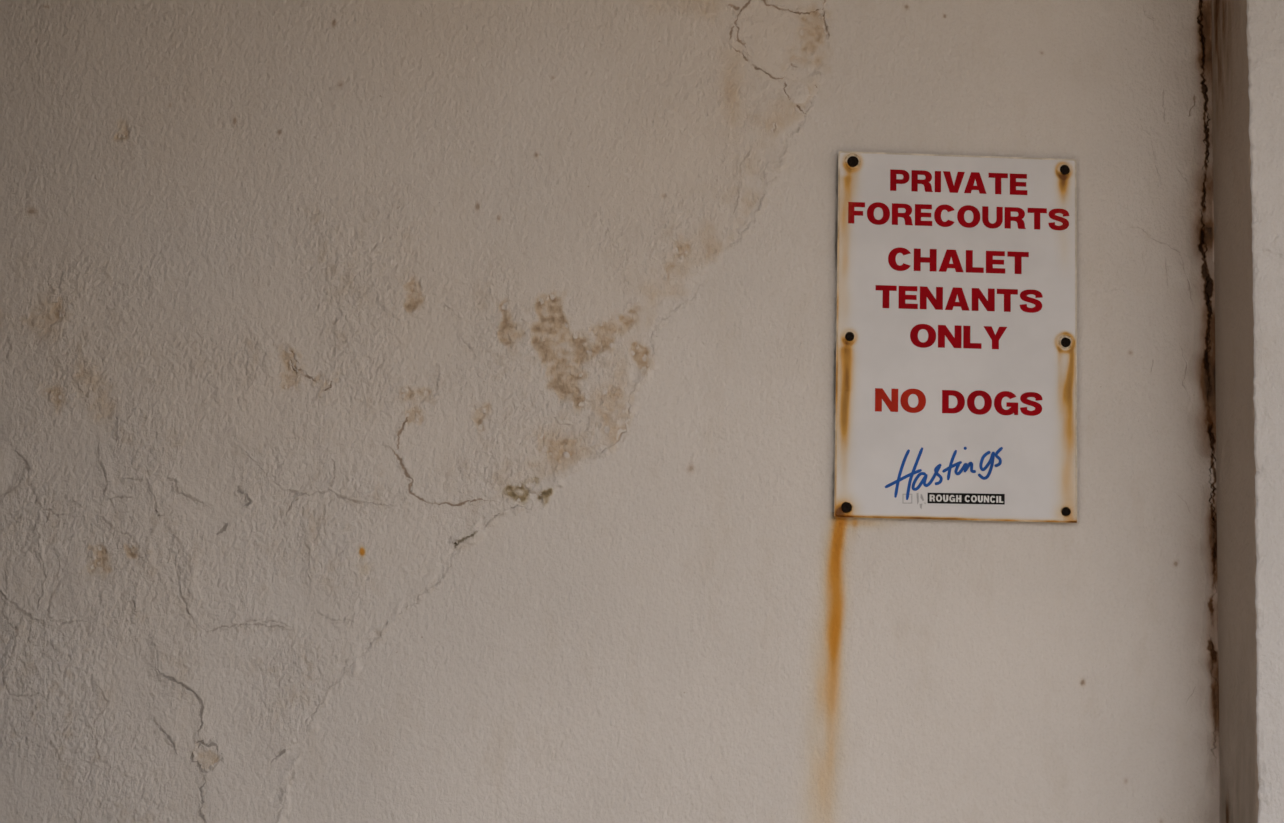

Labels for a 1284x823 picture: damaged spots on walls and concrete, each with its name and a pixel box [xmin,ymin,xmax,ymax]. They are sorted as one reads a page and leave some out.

crack [1197,0,1219,723]